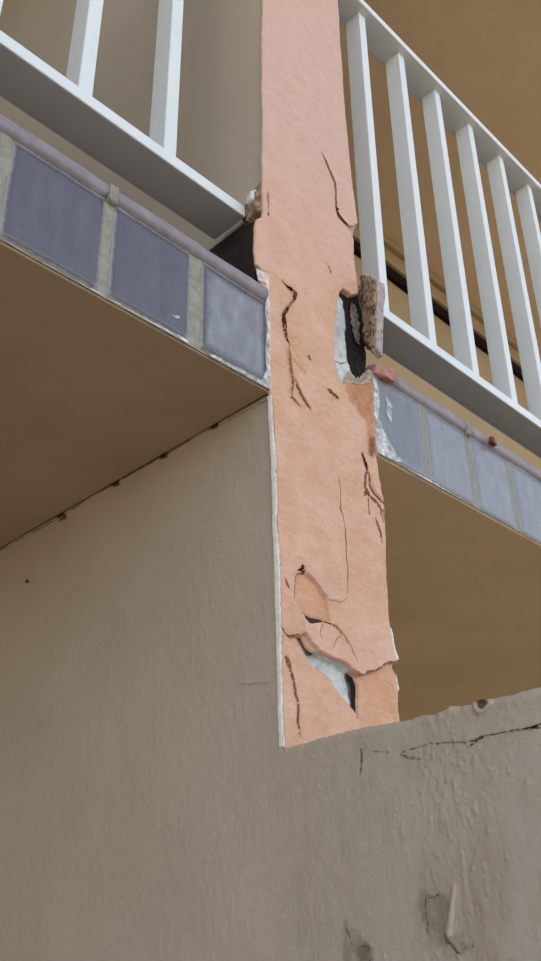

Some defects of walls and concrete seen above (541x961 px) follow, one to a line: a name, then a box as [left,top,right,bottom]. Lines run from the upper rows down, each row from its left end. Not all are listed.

crack [322,153,357,240]
crack [282,281,297,344]
spalling [334,292,373,385]
crack [237,615,343,734]
spalling [285,564,399,712]
crack [360,723,541,773]